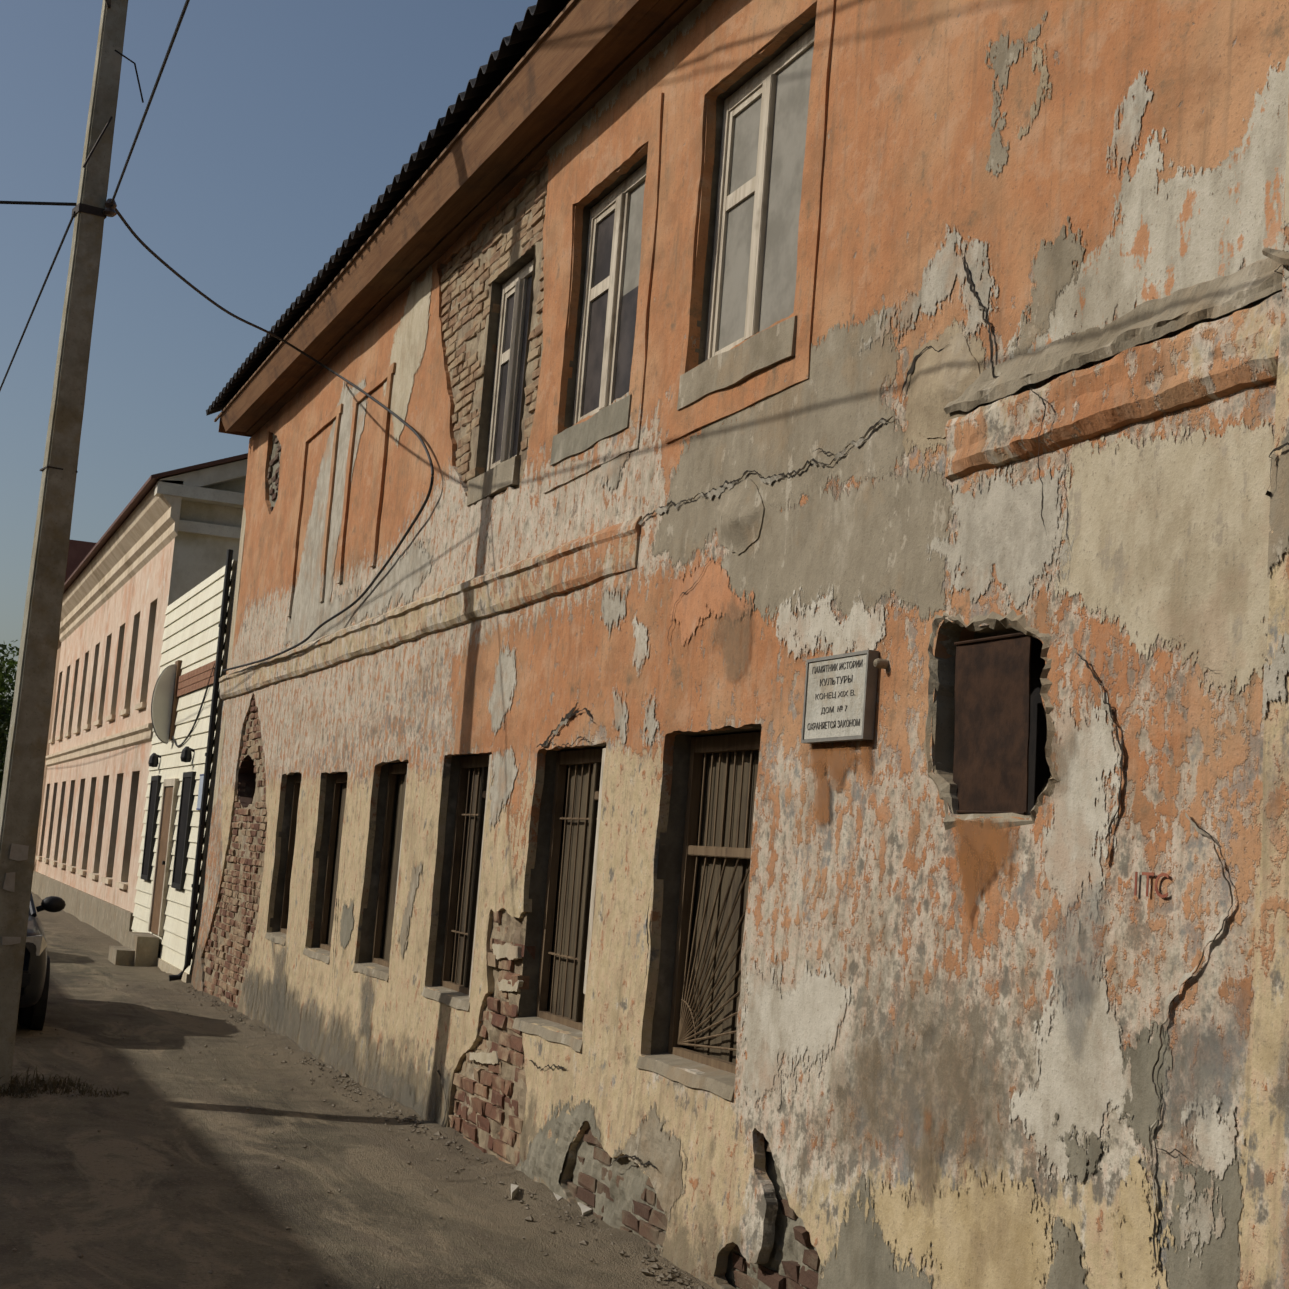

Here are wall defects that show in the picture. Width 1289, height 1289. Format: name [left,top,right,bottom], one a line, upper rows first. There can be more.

flaking render [280,161,548,652]
crack [638,345,947,525]
peeling [858,223,998,359]
crack [961,250,1061,535]
peeling [1007,55,1289,358]
flaking render [204,695,267,1008]
peeling [669,542,754,649]
crack [1073,650,1123,864]
peeling [924,417,1289,933]
flaking render [448,909,668,1252]
peeling [725,951,1247,1289]
crack [1149,812,1241,1269]